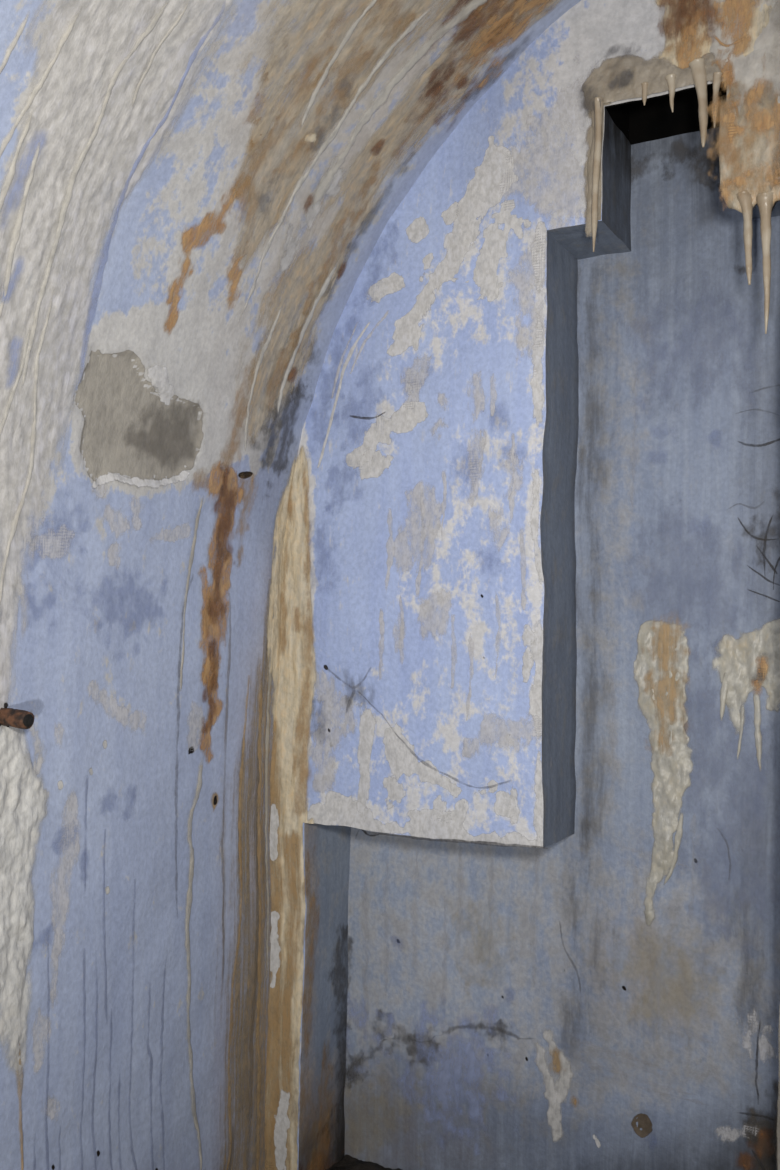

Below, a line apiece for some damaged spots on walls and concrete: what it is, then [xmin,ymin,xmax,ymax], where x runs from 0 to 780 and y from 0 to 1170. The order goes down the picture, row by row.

leakage [582,0,780,236]
spalling [74,350,203,567]
corrosion [165,0,560,763]
peeling [346,67,597,479]
peeling [489,450,544,584]
peeling [307,622,543,848]
peeling [50,781,80,1003]
leakage [223,596,312,1170]
leakage [717,1010,780,1170]